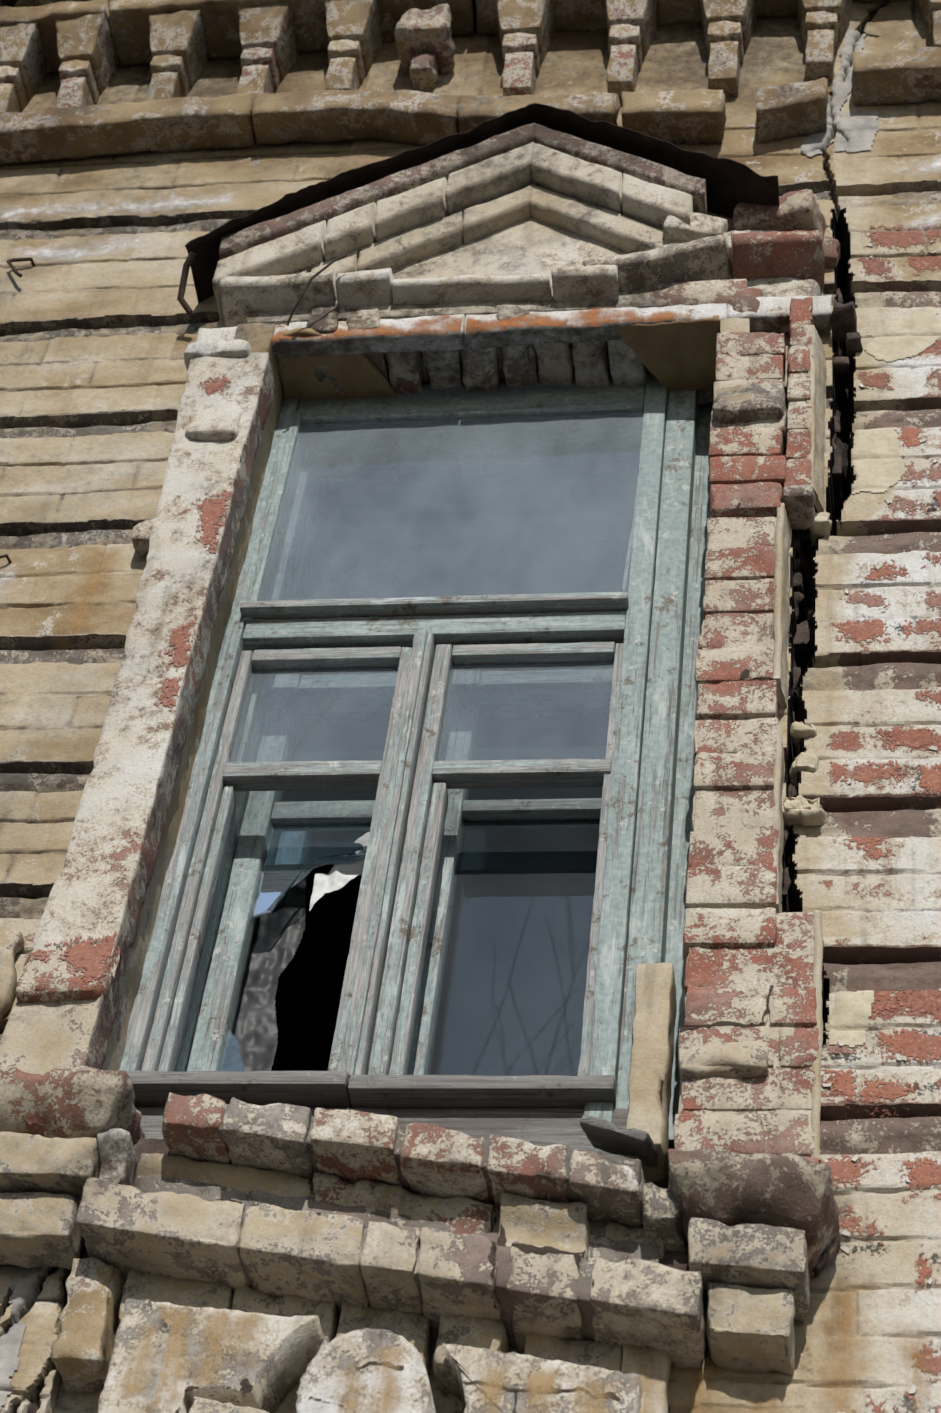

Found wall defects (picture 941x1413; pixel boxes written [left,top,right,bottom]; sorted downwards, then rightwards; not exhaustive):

crack [824,135,858,308]
peeling [856,221,941,280]
peeling [879,427,941,514]
peeling [192,489,232,553]
peeling [154,616,197,712]
crack [700,341,856,913]
peeling [822,551,941,649]
peeling [828,726,941,810]
peeling [25,930,118,986]
crack [822,970,830,1046]
peeling [821,988,941,1119]
peeling [820,1151,941,1260]